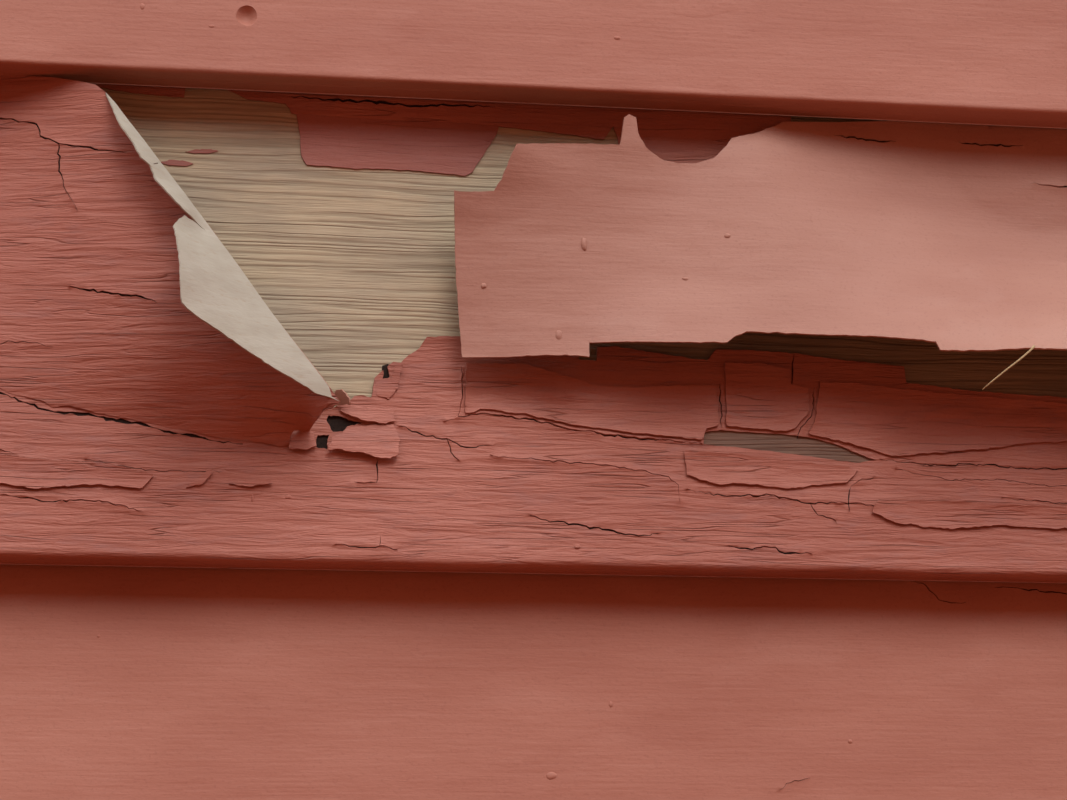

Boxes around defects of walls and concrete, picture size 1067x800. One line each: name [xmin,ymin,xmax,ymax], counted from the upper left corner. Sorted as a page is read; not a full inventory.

crack [0,118,125,209]
crack [70,286,157,303]
peeling [0,76,1067,489]
crack [461,370,666,441]
crack [407,428,486,460]
crack [702,460,1067,519]
crack [533,516,658,537]
crack [728,545,810,554]